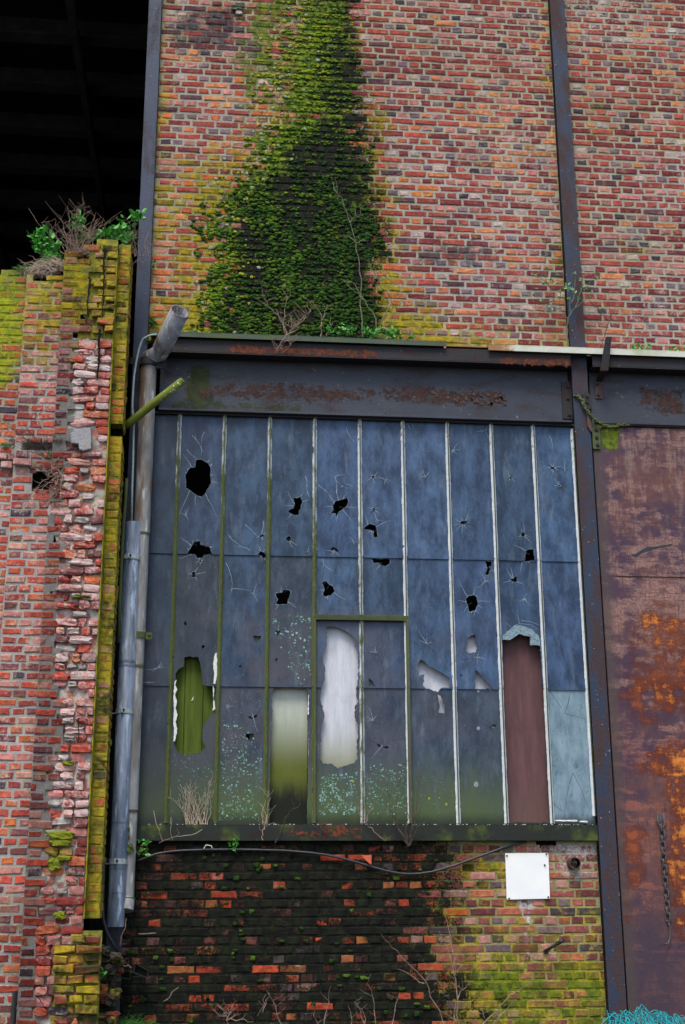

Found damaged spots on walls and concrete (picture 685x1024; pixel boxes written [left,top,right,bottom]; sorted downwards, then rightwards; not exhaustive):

rust [499,357,569,367]
rust [191,383,502,406]
spalling [29,338,112,1024]
rust [621,600,685,723]
rust [289,823,362,839]
rust [624,828,647,887]
rust [636,741,685,940]